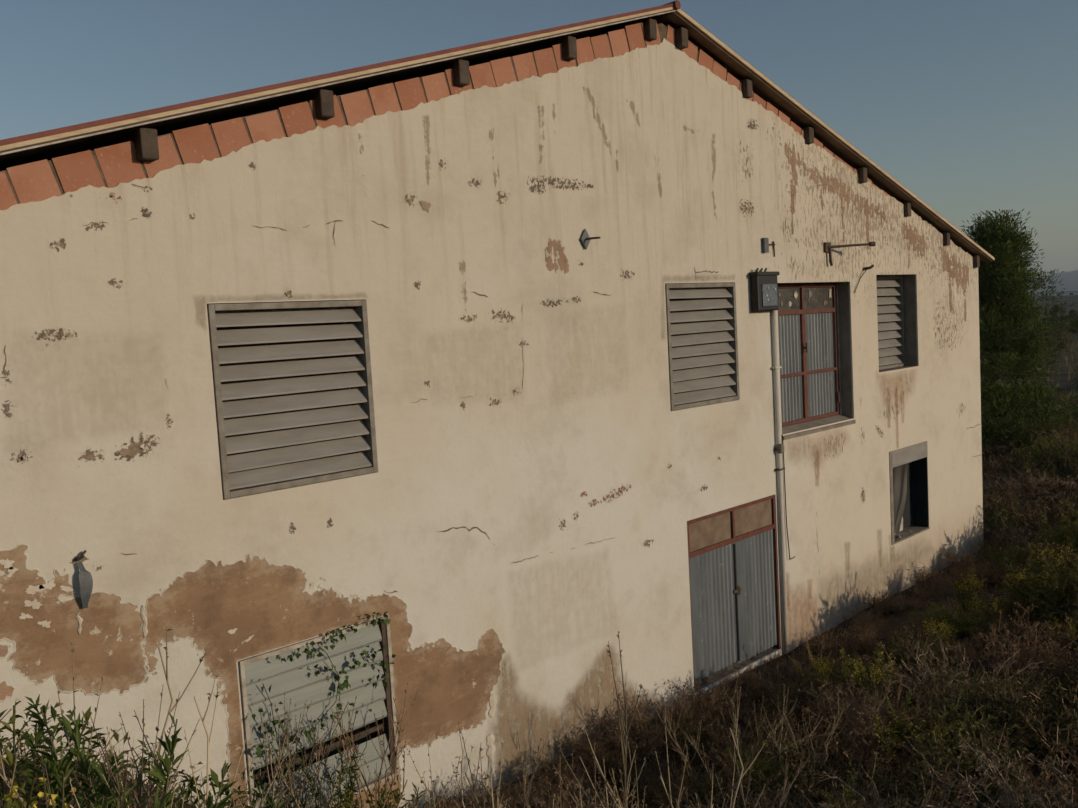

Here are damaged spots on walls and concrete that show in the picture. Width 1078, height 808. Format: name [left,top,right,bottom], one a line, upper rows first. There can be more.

spalling [527,176,593,194]
damp [780,142,886,249]
crack [255,220,342,246]
damp [902,223,971,321]
spalling [31,328,77,346]
spalling [78,433,159,463]
spalling [581,485,631,507]
crack [439,526,494,544]
peeling [0,543,506,808]
damp [496,652,663,786]